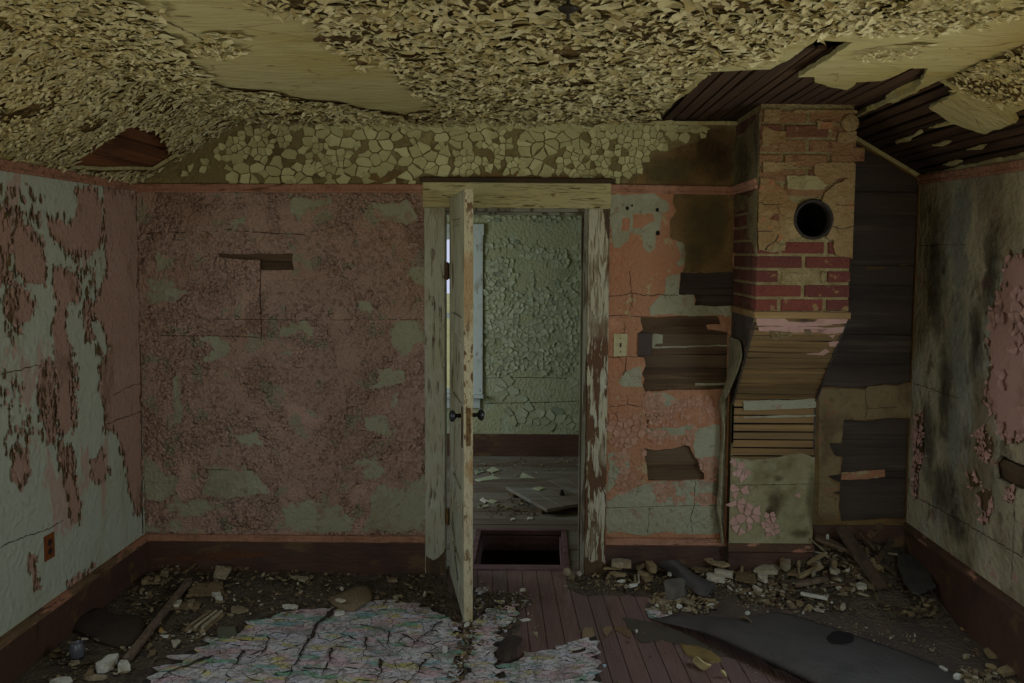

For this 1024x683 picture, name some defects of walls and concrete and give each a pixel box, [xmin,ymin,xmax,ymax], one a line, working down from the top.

peeling [0,0,1024,538]
crack [485,377,575,404]
peeling [28,552,43,593]